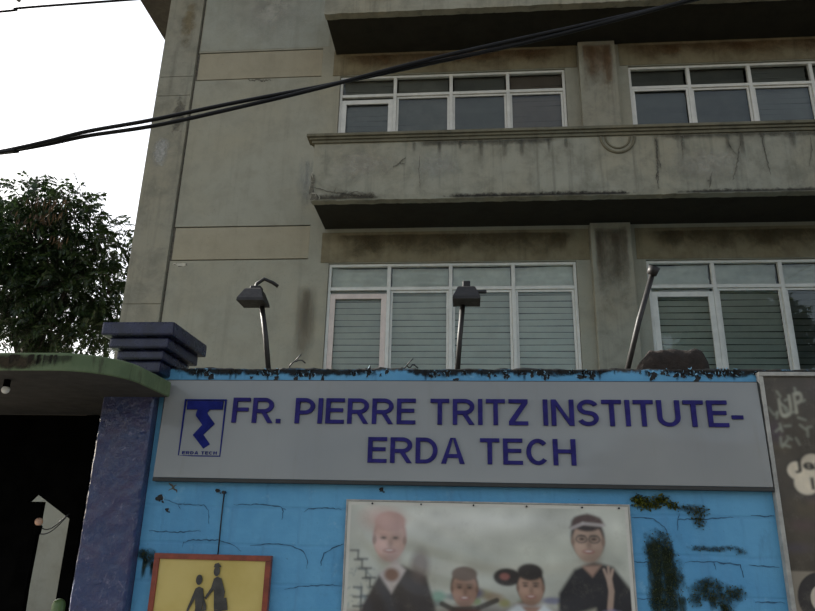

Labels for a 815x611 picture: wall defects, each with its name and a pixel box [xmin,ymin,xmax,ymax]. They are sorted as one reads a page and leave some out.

crack [654,139,662,189]
leakage [0,354,72,369]
crack [150,483,343,565]